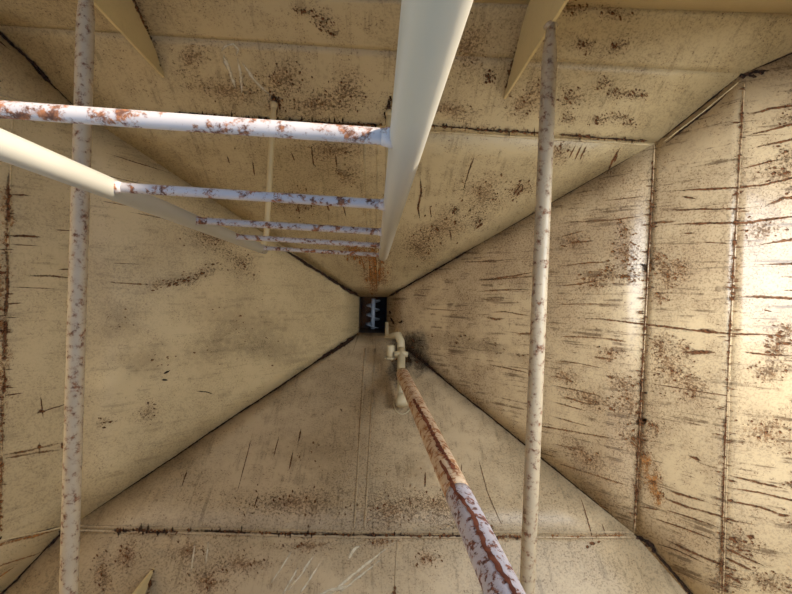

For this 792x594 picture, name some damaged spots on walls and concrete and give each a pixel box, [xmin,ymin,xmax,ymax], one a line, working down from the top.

rust [401,158,535,267]
rust [340,239,392,313]
rust [479,272,532,300]